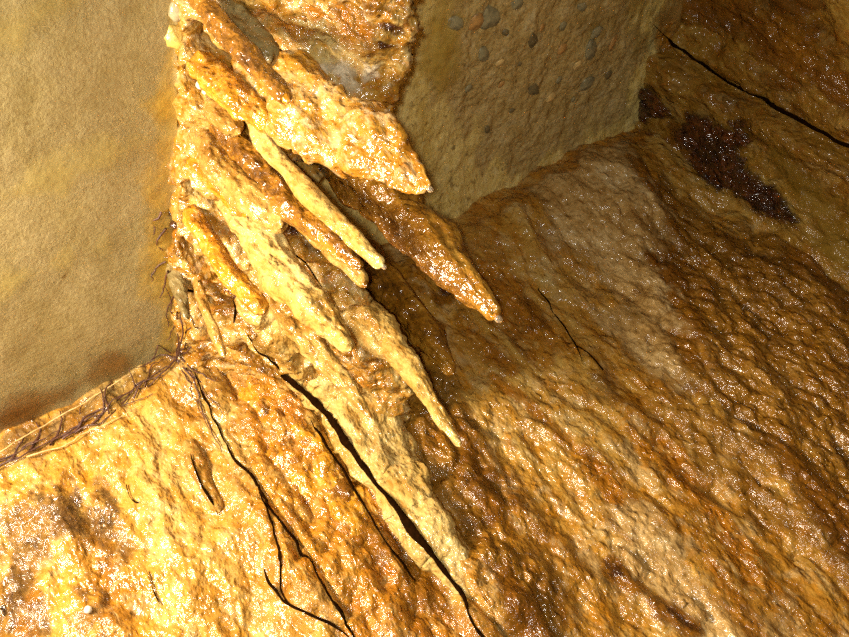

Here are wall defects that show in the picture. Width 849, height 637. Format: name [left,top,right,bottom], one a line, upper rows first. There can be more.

damp [319,61,378,91]
crack [653,24,849,148]
rust [656,0,849,112]
damp [150,234,173,299]
crack [190,366,355,637]
crack [233,299,484,637]
damp [232,373,496,637]
damp [421,367,576,637]